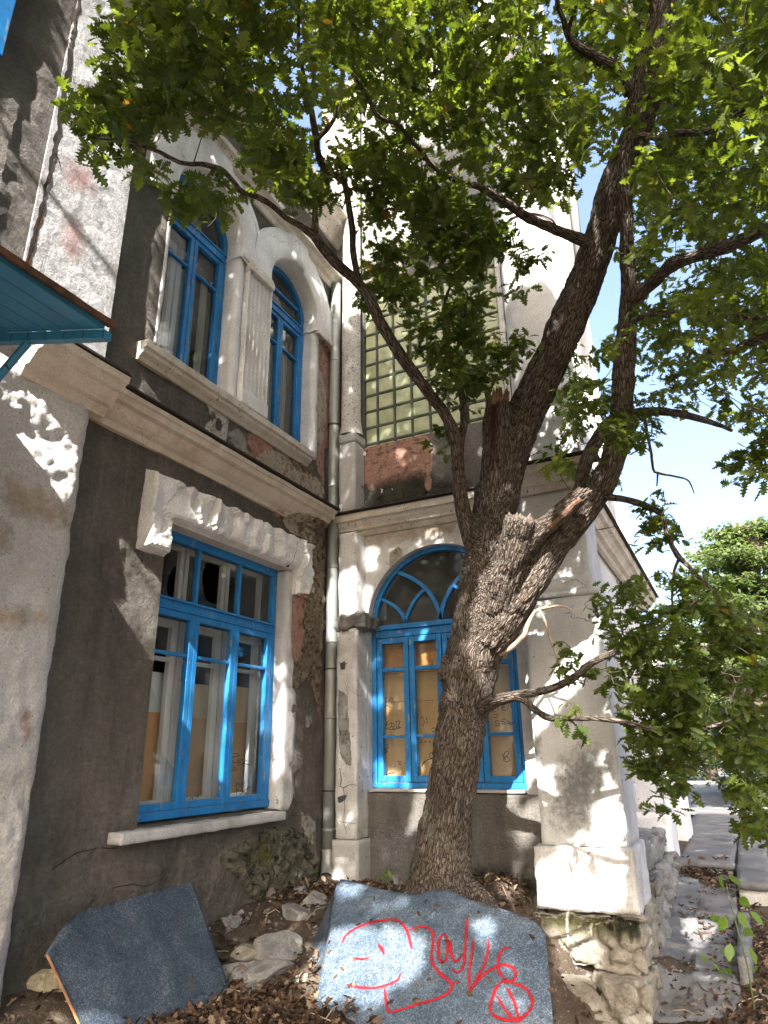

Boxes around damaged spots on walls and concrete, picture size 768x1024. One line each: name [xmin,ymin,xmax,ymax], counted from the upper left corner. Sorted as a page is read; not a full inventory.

spalling [204,340,332,498]
peeling [363,436,434,493]
spalling [281,513,329,730]
peeling [338,690,352,765]
leakage [556,753,600,821]
crack [52,848,117,870]